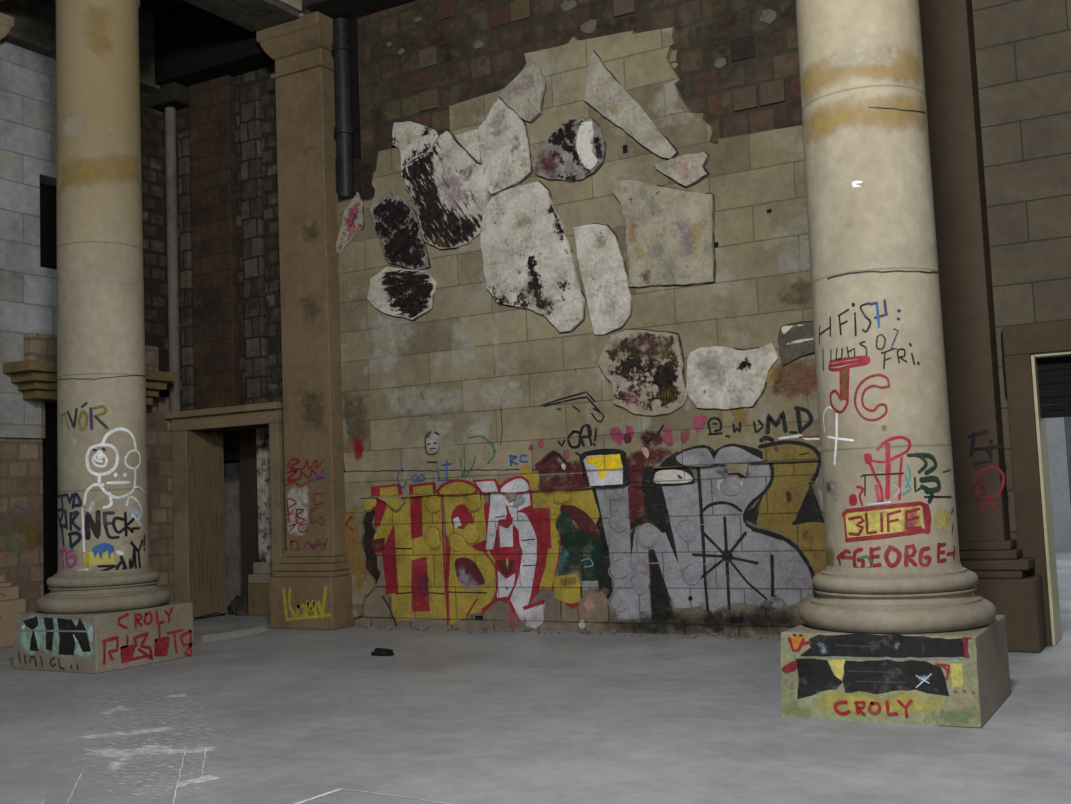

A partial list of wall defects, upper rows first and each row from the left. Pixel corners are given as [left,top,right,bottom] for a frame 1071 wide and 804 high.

flaking render [336,51,779,415]
water stain [811,99,924,135]